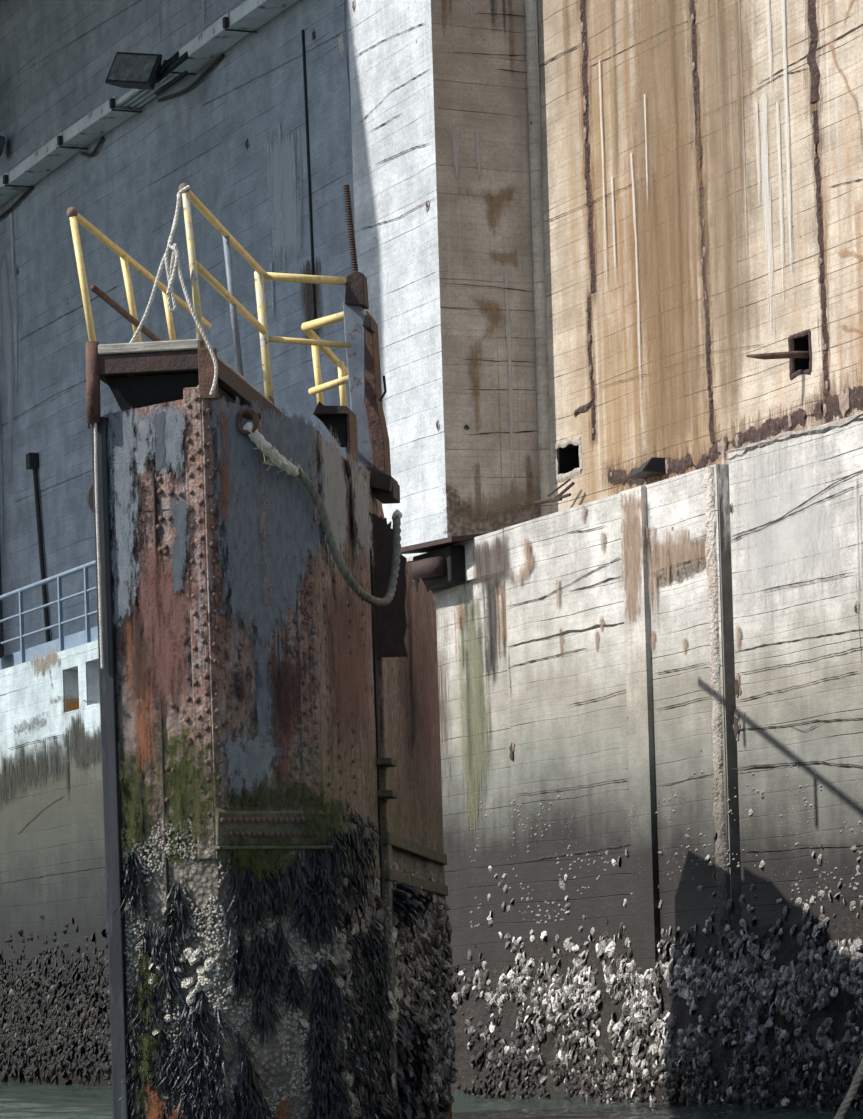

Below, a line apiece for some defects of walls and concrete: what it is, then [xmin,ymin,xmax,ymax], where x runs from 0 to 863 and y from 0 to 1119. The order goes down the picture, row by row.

crack [701,24,863,117]
damp [0,733,68,808]
peeling [105,403,185,626]
rust [116,546,197,788]
peeling [169,494,191,593]
peeling [208,396,374,799]
damp [459,536,512,761]
rust [146,1084,183,1119]